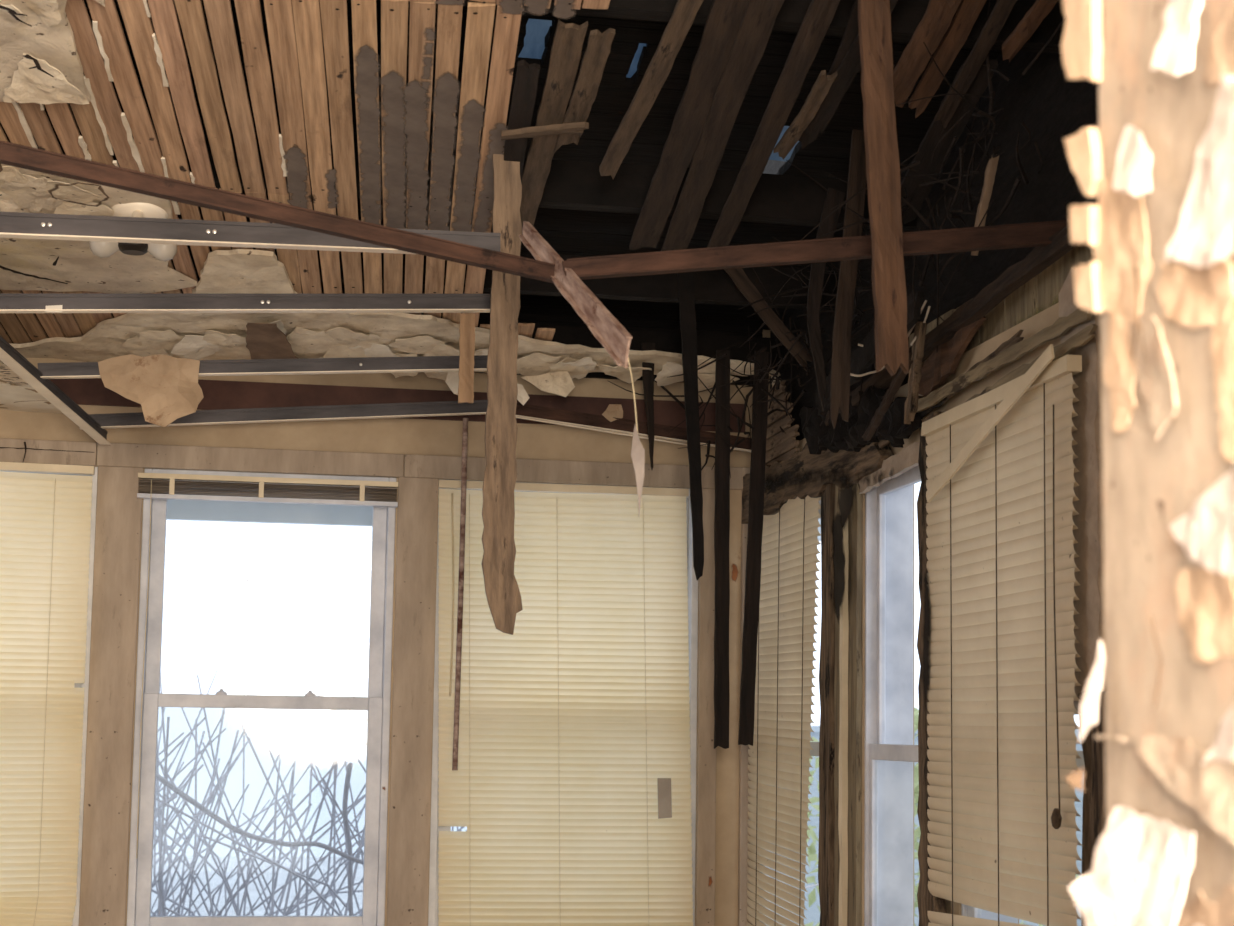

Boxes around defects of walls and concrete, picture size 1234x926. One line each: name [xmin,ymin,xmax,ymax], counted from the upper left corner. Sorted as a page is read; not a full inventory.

damp [500,0,575,19]
peeling [0,0,91,105]
damp [355,28,508,232]
peeling [0,164,173,219]
crack [0,256,68,284]
peeling [0,237,298,294]
peeling [9,313,490,362]
peeling [1061,0,1234,663]
peeling [517,335,754,405]
peeling [602,404,623,422]
peeling [1065,767,1086,791]
peeling [1069,640,1234,926]